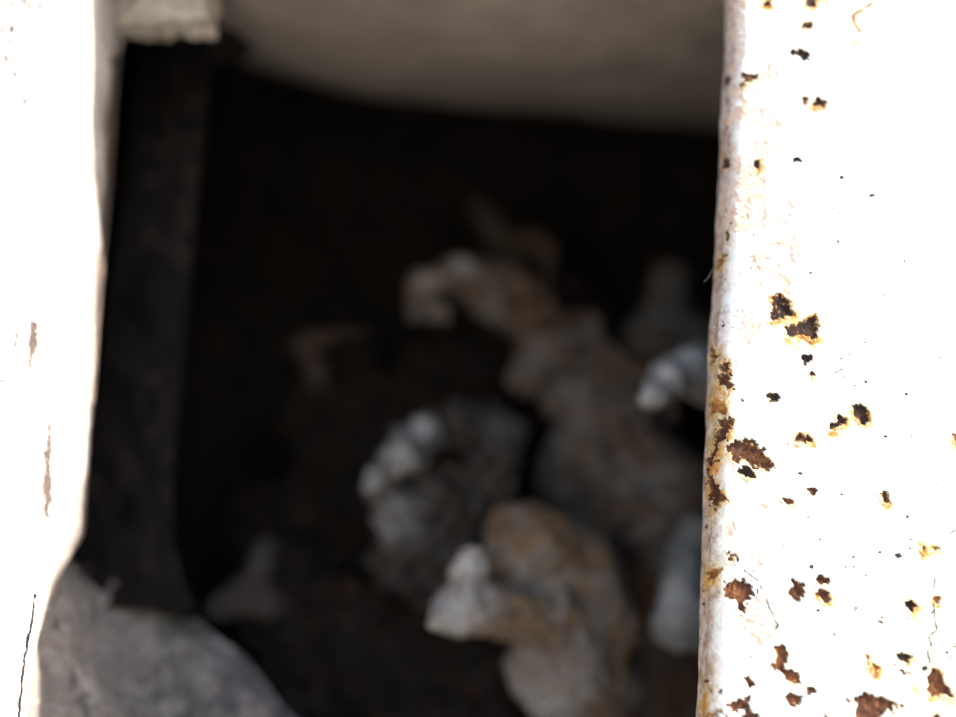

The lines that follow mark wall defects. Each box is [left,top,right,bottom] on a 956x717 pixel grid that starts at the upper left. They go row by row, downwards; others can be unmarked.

rust [800,0,827,31]
peeling [720,0,812,298]
rust [768,292,824,380]
rust [787,432,817,448]
rust [827,403,874,437]
rust [880,490,893,510]
rust [909,538,942,560]
rust [702,550,758,617]
rust [788,574,833,608]
rust [904,589,947,629]
rust [769,644,903,717]
rust [842,646,955,717]